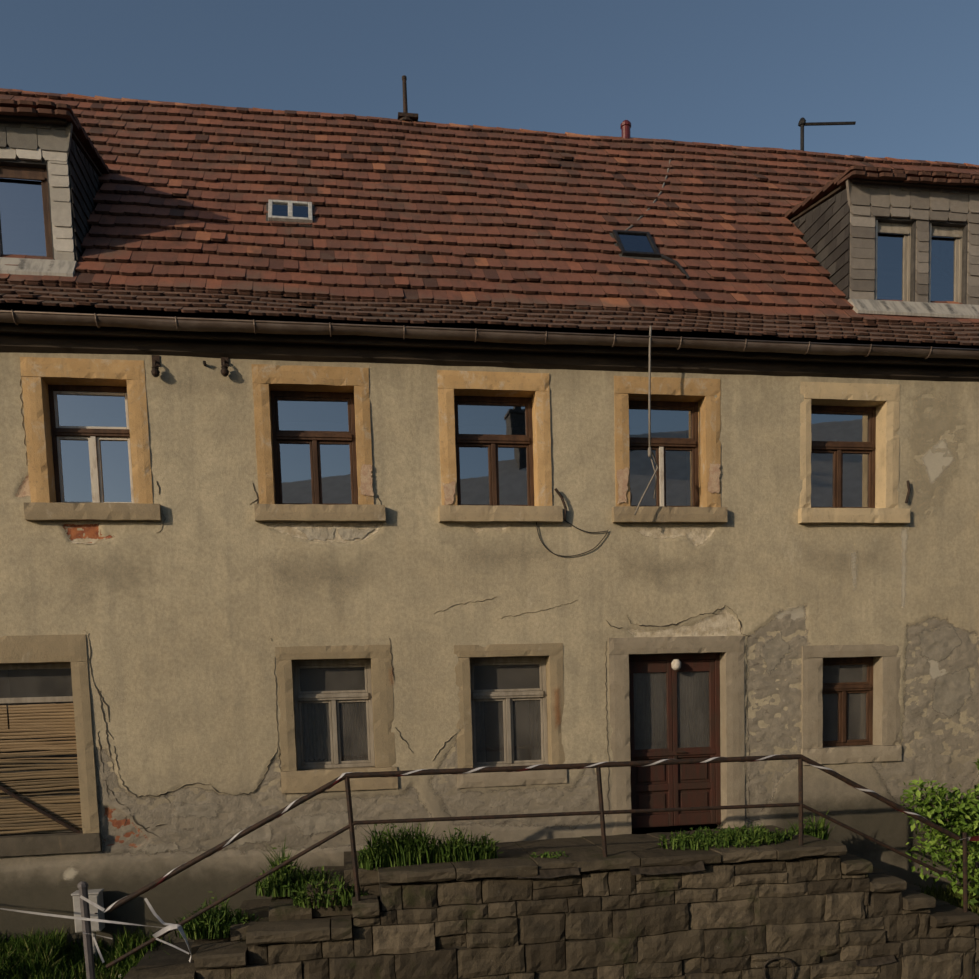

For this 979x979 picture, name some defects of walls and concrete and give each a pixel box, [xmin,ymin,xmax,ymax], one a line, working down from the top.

spalling [62,524,112,544]
peeling [923,441,953,482]
crack [84,630,281,836]
spalling [95,749,431,855]
spalling [431,741,606,829]
crack [606,605,751,805]
spalling [628,607,808,822]
spalling [871,618,979,804]